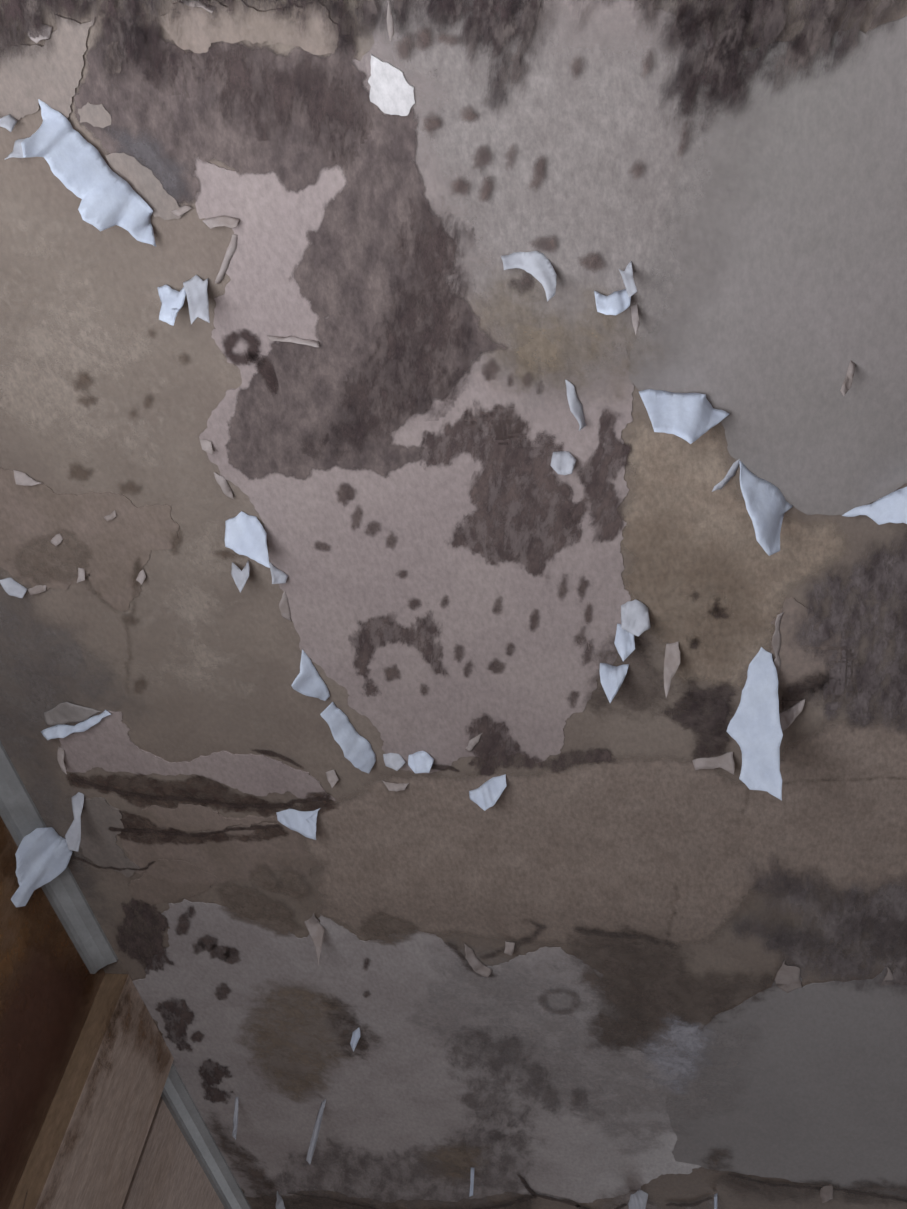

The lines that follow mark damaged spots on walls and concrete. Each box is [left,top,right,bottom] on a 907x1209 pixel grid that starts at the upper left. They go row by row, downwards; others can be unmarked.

water stain [0,0,907,729]
peeling [158,0,907,792]
water stain [93,992,203,1079]
mould [117,899,239,974]
mould [199,1059,233,1103]
mould [215,984,230,1000]
water stain [249,988,377,1099]
peeling [41,702,907,1209]
water stain [736,872,907,987]
crack [473,1174,627,1209]